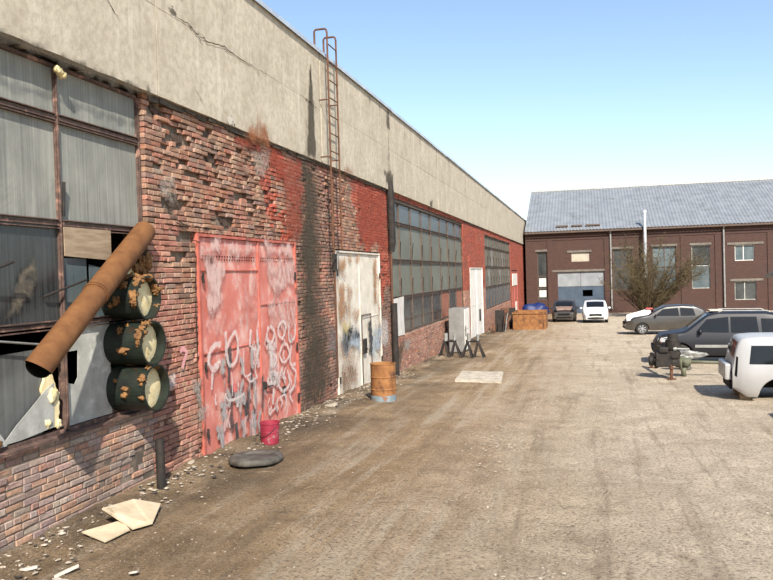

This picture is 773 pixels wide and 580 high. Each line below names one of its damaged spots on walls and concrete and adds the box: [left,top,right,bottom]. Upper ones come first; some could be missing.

crack [180,19,274,79]
water stain [308,66,316,156]
water stain [301,167,331,403]